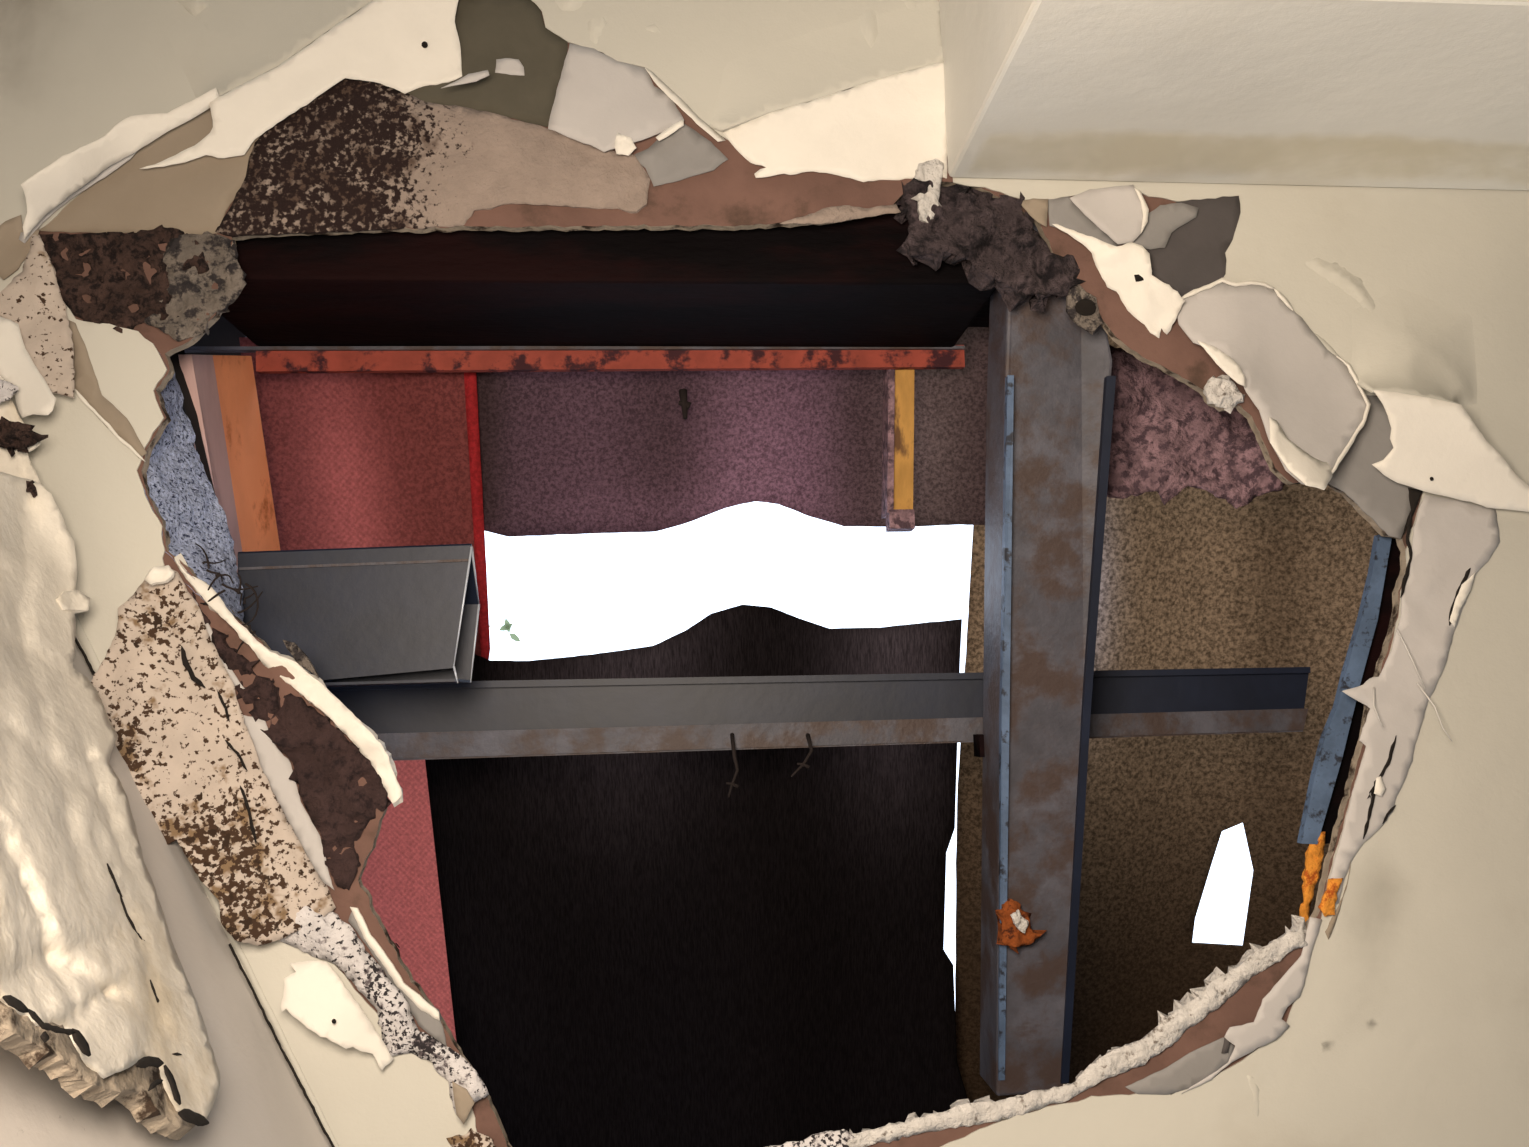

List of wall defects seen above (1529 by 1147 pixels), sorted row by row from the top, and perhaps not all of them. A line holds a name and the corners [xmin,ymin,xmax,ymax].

flaking render [0,0,1371,490]
flaking render [26,480,38,498]
peeling [56,589,90,611]
flaking render [69,320,403,807]
peeling [243,715,334,890]
peeling [846,390,1529,1147]
peeling [281,960,394,1070]
peeling [348,907,447,1046]
corrosion [995,899,1047,954]
corrosion [1299,831,1343,922]
peeling [452,1081,475,1124]